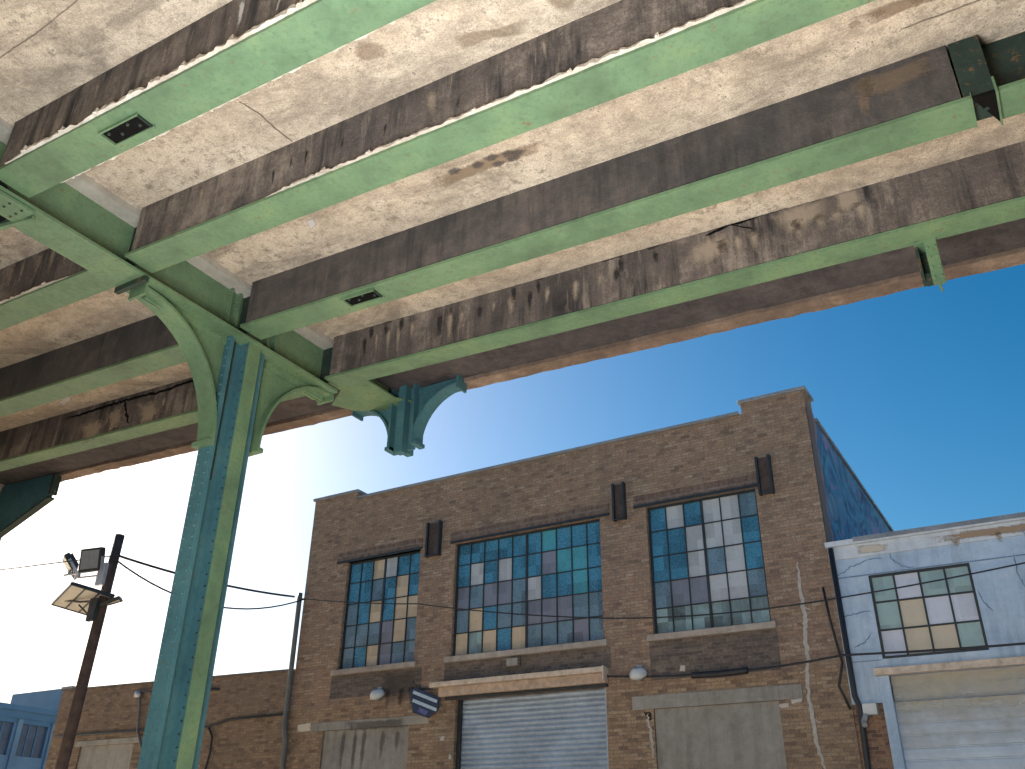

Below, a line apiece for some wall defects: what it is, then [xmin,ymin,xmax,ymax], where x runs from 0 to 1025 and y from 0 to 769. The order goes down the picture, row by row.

crack [0,0,78,58]
crack [901,0,981,30]
crack [239,102,293,142]
crack [838,553,912,576]
crack [796,562,826,769]